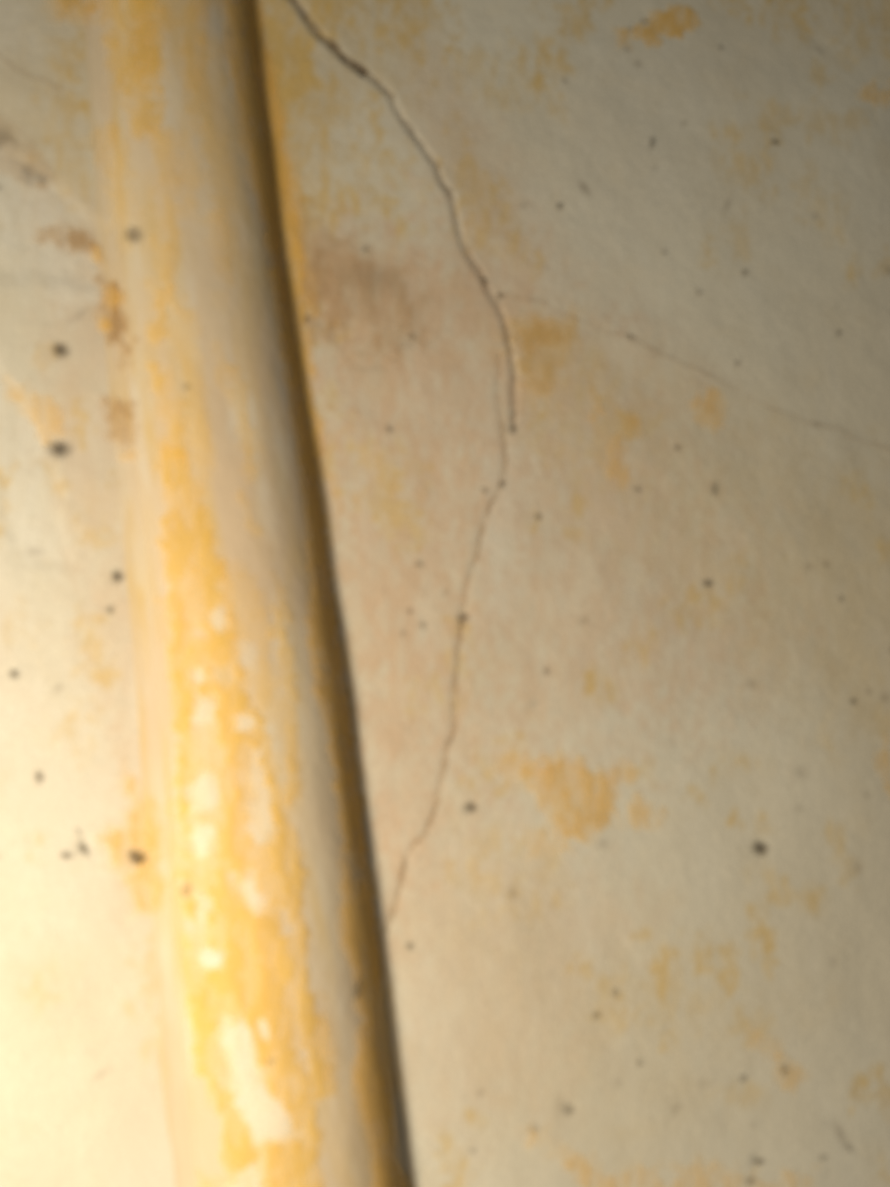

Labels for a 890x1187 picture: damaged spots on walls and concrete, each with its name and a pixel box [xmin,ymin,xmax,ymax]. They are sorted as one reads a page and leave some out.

crack [329,41,365,74]